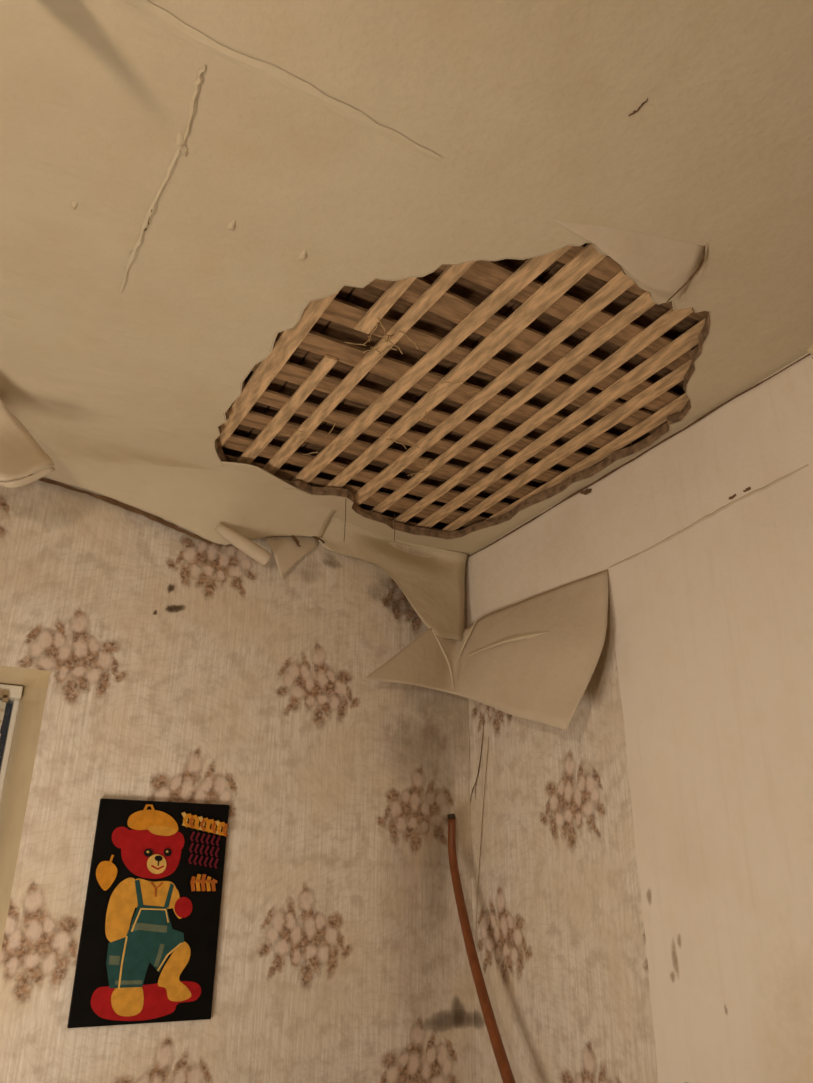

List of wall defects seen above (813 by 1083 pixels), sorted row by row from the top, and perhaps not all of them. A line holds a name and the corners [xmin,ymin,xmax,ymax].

crack [120,66,207,293]
spalling [214,409,229,466]
flaking render [279,220,813,1083]